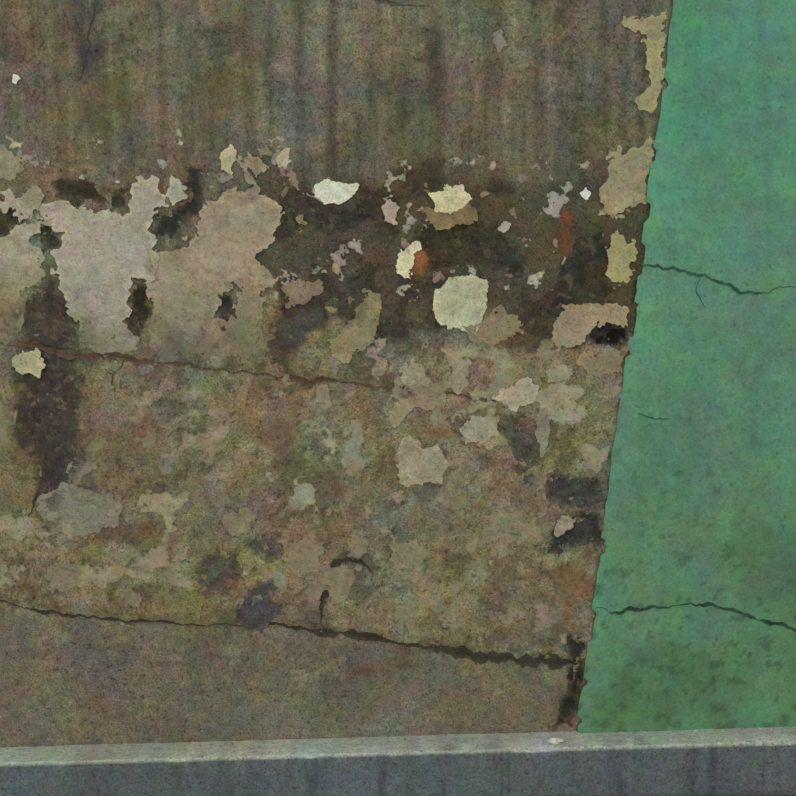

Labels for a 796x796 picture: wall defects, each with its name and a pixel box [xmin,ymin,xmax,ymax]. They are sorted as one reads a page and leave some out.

crack [375,0,429,8]
crack [78,0,96,81]
peeling [621,9,667,113]
crack [636,262,796,307]
damp [28,348,63,388]
crack [0,340,411,391]
crack [446,392,485,402]
crack [331,557,373,575]
crack [0,590,578,670]
crack [597,602,796,633]
spalling [548,632,586,731]